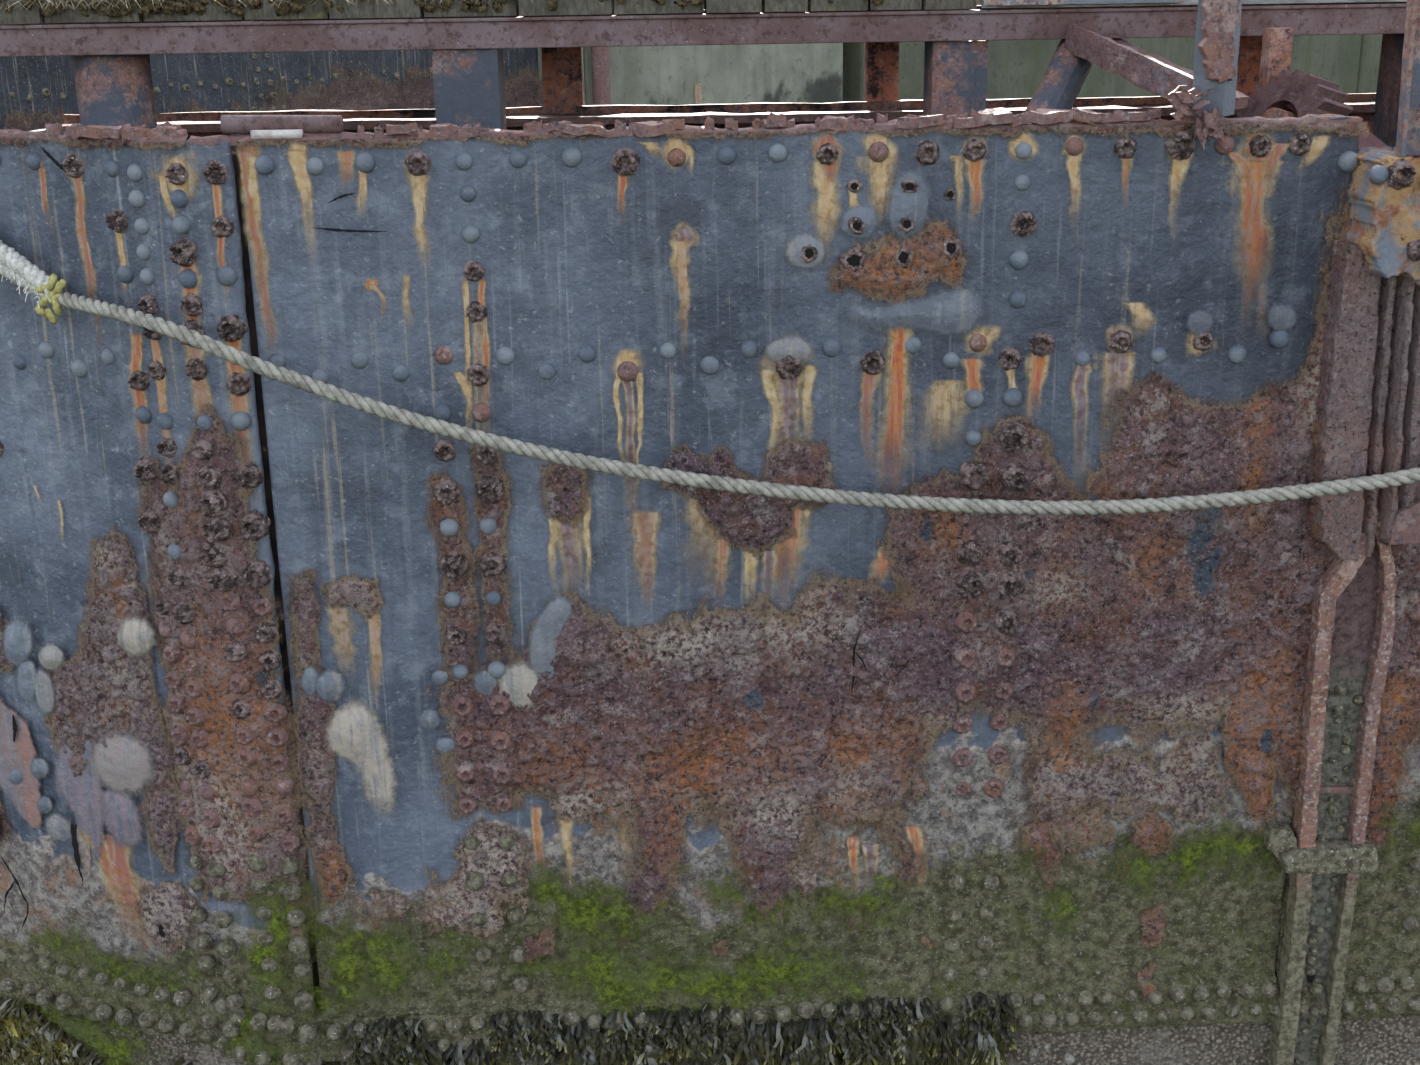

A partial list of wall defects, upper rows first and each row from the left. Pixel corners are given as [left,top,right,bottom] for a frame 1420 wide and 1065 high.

rust [230,61,435,111]
rust [71,177,95,300]
rust [0,107,195,218]
rust [235,138,441,336]
rust [641,125,1202,236]
rust [1218,122,1370,271]
rust [130,335,169,438]
rust [424,179,1354,924]
rust [1366,543,1420,849]
peeling [0,699,105,857]
spalling [539,786,635,833]
spalling [786,822,851,910]